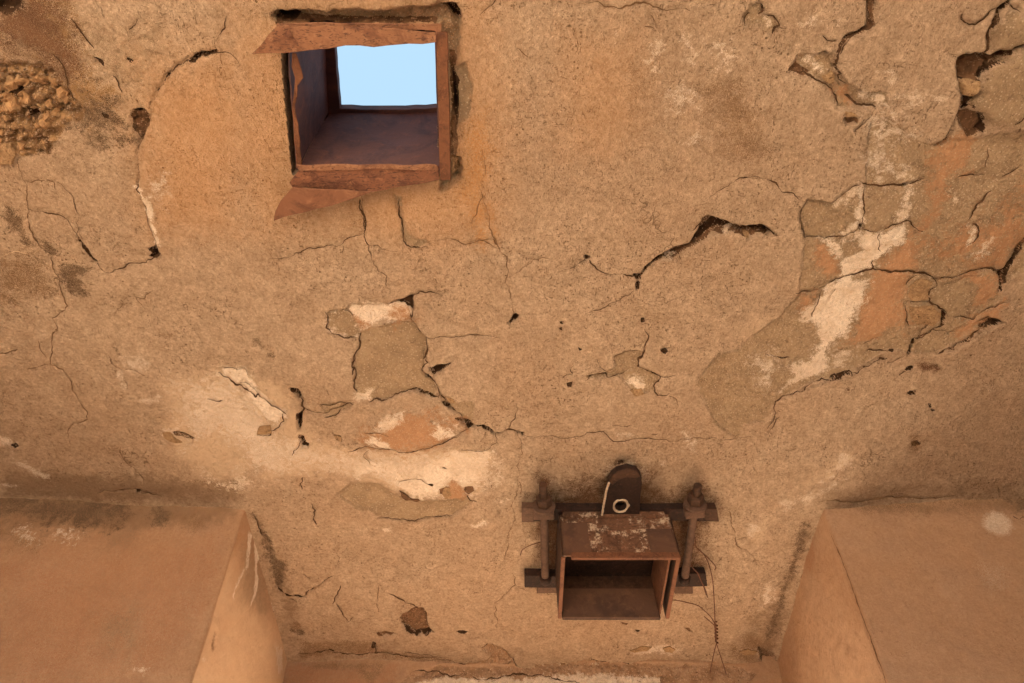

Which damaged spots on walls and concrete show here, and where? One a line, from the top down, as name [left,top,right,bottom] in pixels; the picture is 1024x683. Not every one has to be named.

flaking render [0,54,86,165]
crack [0,18,240,443]
crack [268,196,396,287]
flaking render [637,215,778,289]
flaking render [696,0,1024,439]
flaking render [218,365,288,436]
flaking render [319,294,475,428]
flaking render [563,317,678,405]
crack [290,150,1024,628]
flaking render [336,433,497,522]
corrosion [518,458,734,571]
flaking render [371,594,432,648]